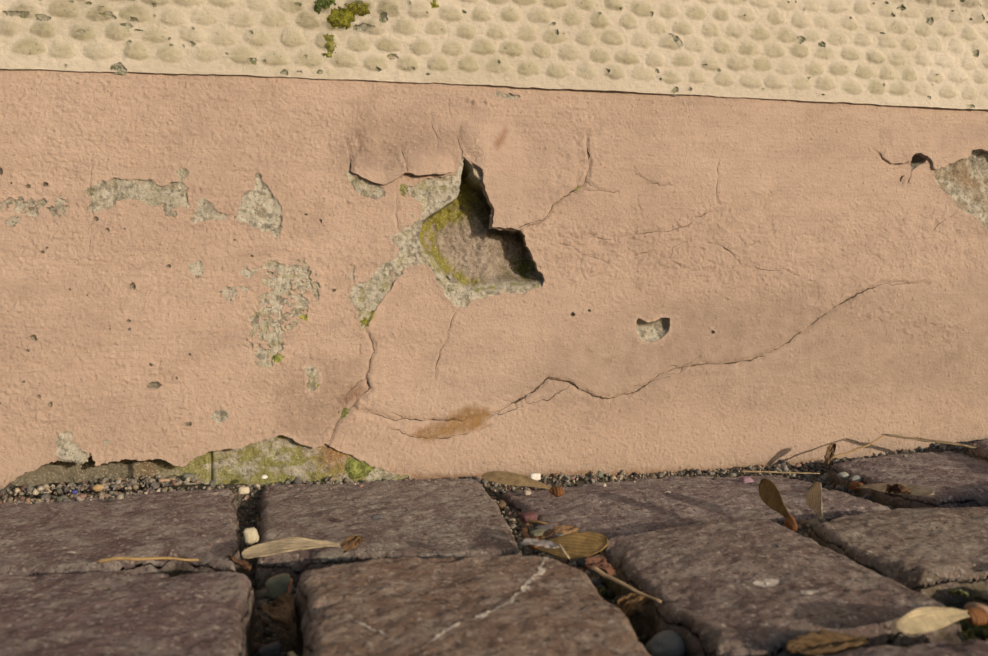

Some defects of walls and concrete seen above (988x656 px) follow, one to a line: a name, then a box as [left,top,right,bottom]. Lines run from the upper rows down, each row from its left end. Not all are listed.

peeling [0,182,69,227]
peeling [84,168,283,239]
spalling [900,155,925,184]
spalling [934,149,988,230]
spalling [346,157,543,330]
peeling [219,255,336,368]
crack [325,283,917,441]
hole [636,318,669,343]
spalling [11,429,409,486]